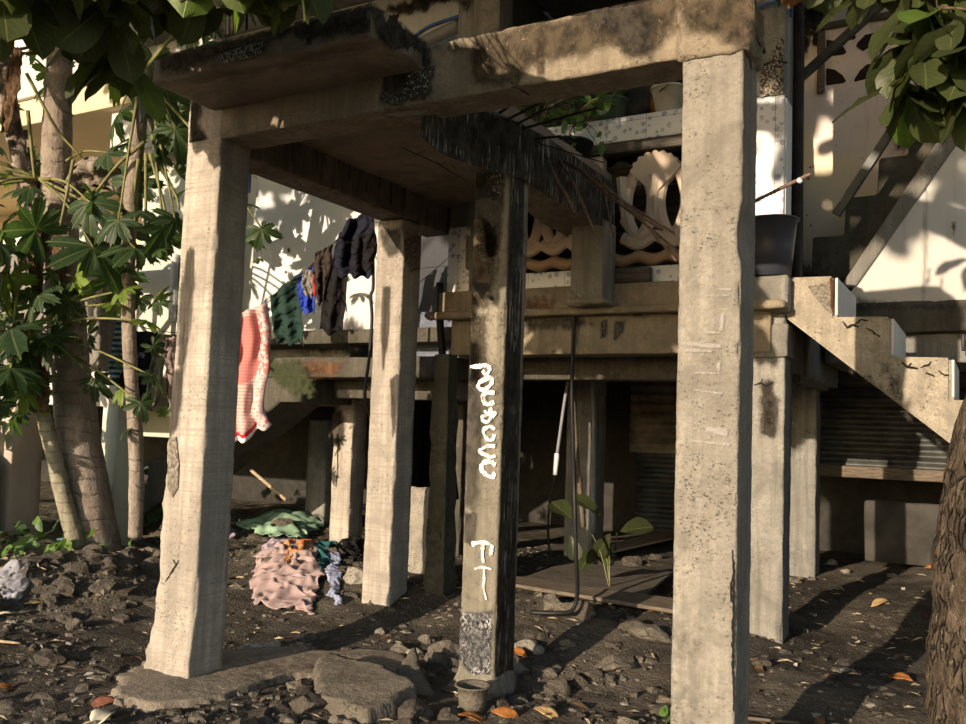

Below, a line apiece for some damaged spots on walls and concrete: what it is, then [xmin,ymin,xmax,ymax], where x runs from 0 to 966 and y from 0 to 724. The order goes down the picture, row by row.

damp [448,0,755,86]
spalling [760,37,784,97]
damp [159,0,615,678]
damp [600,320,624,340]
damp [682,309,727,352]
crack [842,319,880,337]
crack [901,361,949,377]
damp [760,380,778,437]
crack [728,550,736,712]